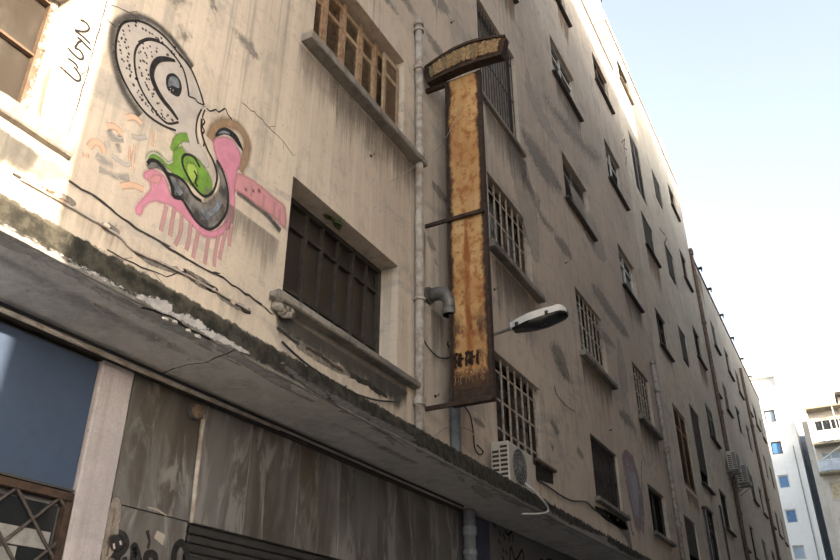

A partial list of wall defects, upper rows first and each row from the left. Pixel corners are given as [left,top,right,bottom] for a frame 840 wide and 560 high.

crack [242,102,293,155]
leakage [207,191,275,251]
leakage [136,294,249,354]
peeling [1,234,416,441]
leakage [278,315,406,407]